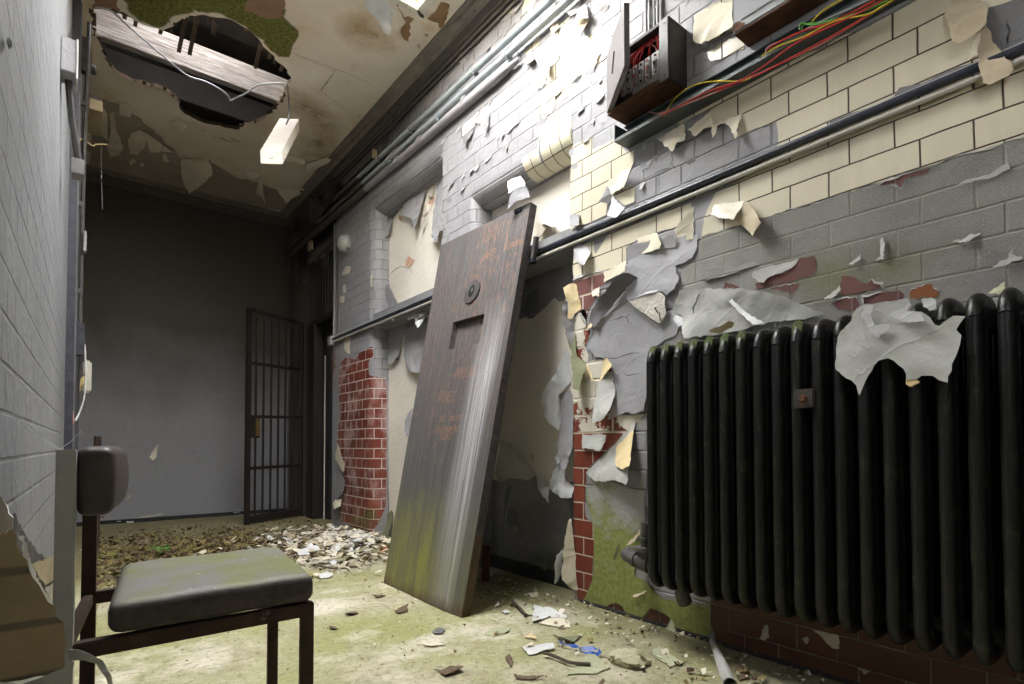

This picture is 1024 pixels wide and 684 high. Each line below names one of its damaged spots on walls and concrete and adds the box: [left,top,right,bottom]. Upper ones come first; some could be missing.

flaking render [245,0,286,19]
flaking render [87,97,304,211]
peeling [284,156,331,173]
peeling [441,101,520,159]
peeling [333,156,491,538]
peeling [492,0,1024,601]
peeling [0,495,113,684]